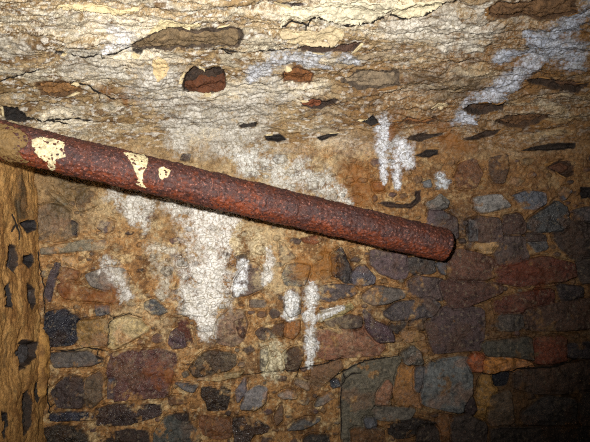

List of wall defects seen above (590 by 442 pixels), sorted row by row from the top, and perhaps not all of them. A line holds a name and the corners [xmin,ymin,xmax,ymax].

crack [279,4,443,31]
crack [0,69,40,82]
crack [70,81,115,100]
crack [71,47,129,59]
spalling [131,20,245,82]
spalling [179,65,227,97]
water stain [437,8,590,125]
crack [35,117,90,125]
water stain [374,113,415,190]
water stain [97,255,133,304]
water stain [104,186,275,341]
water stain [282,280,345,369]